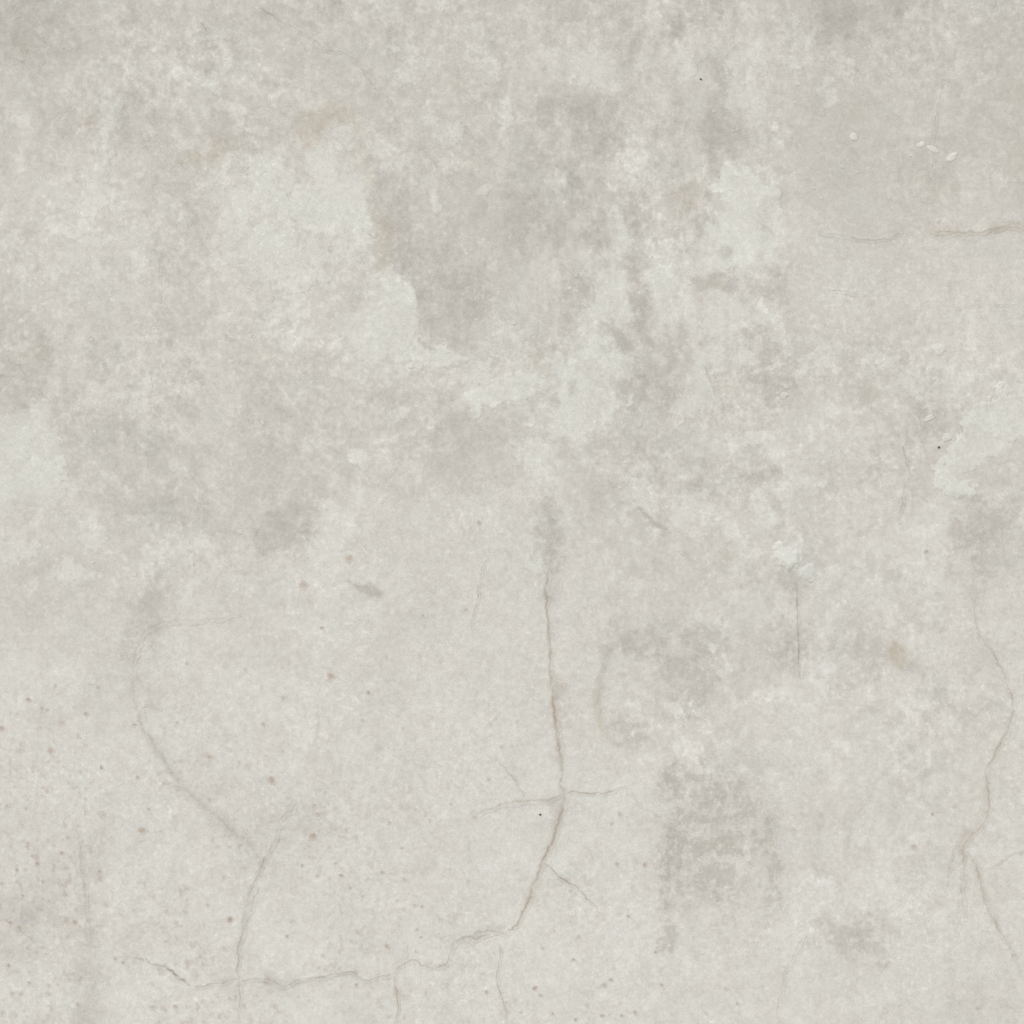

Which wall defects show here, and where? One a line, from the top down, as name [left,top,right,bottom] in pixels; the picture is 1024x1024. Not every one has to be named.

crack [108,551,680,1024]
crack [944,586,1024,984]